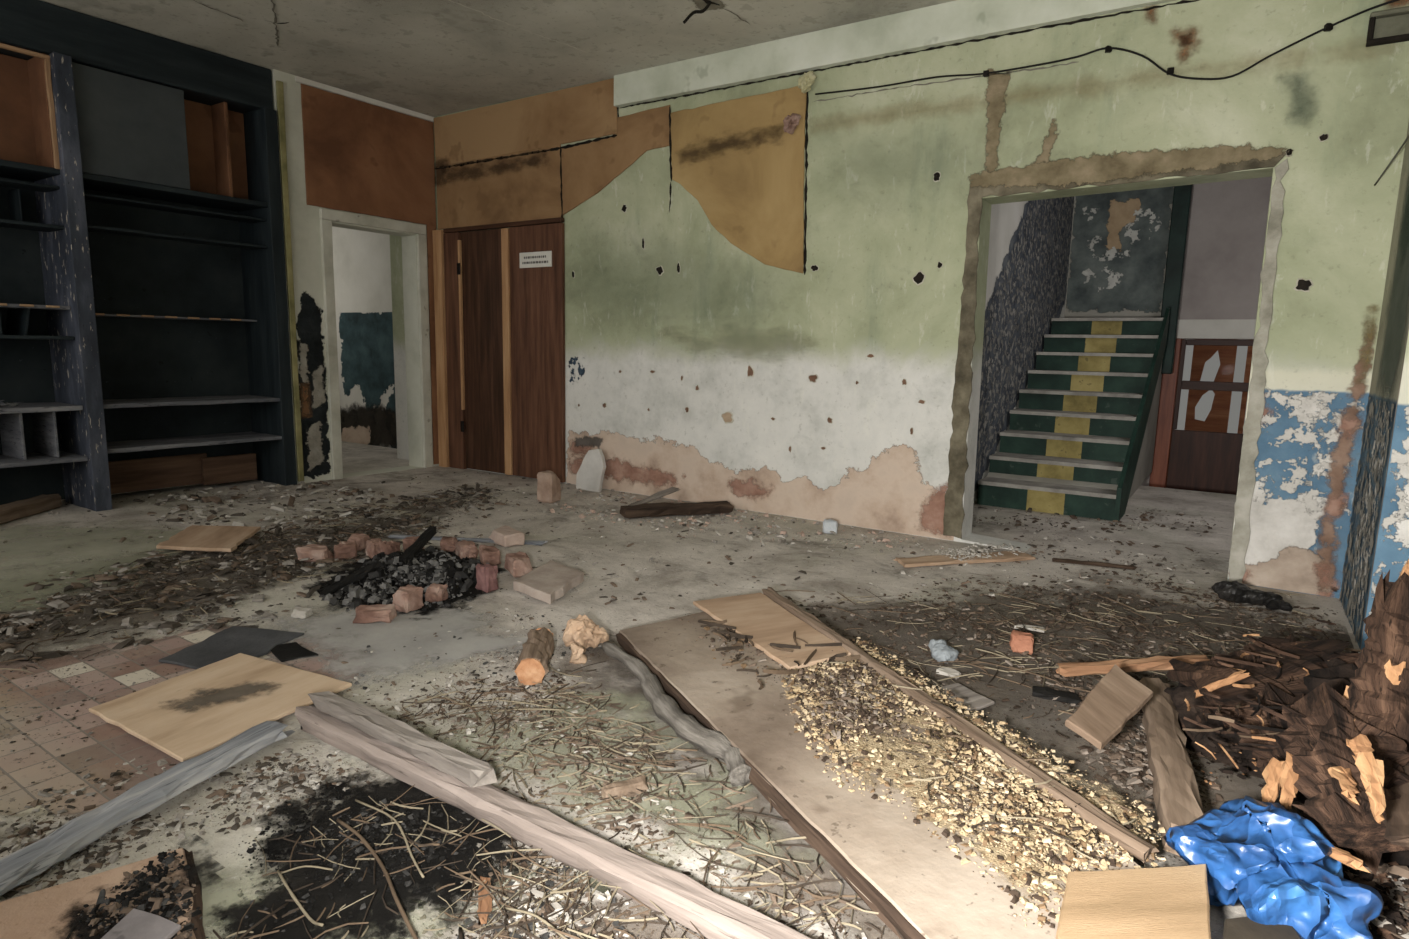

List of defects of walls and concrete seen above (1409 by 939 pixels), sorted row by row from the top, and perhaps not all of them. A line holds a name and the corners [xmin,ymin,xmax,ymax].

crack [194,0,289,46]
crack [444,0,1199,275]
spalling [1294,278,1314,292]
peeling [296,292,396,480]
spalling [566,427,954,541]
peeling [1228,388,1409,643]